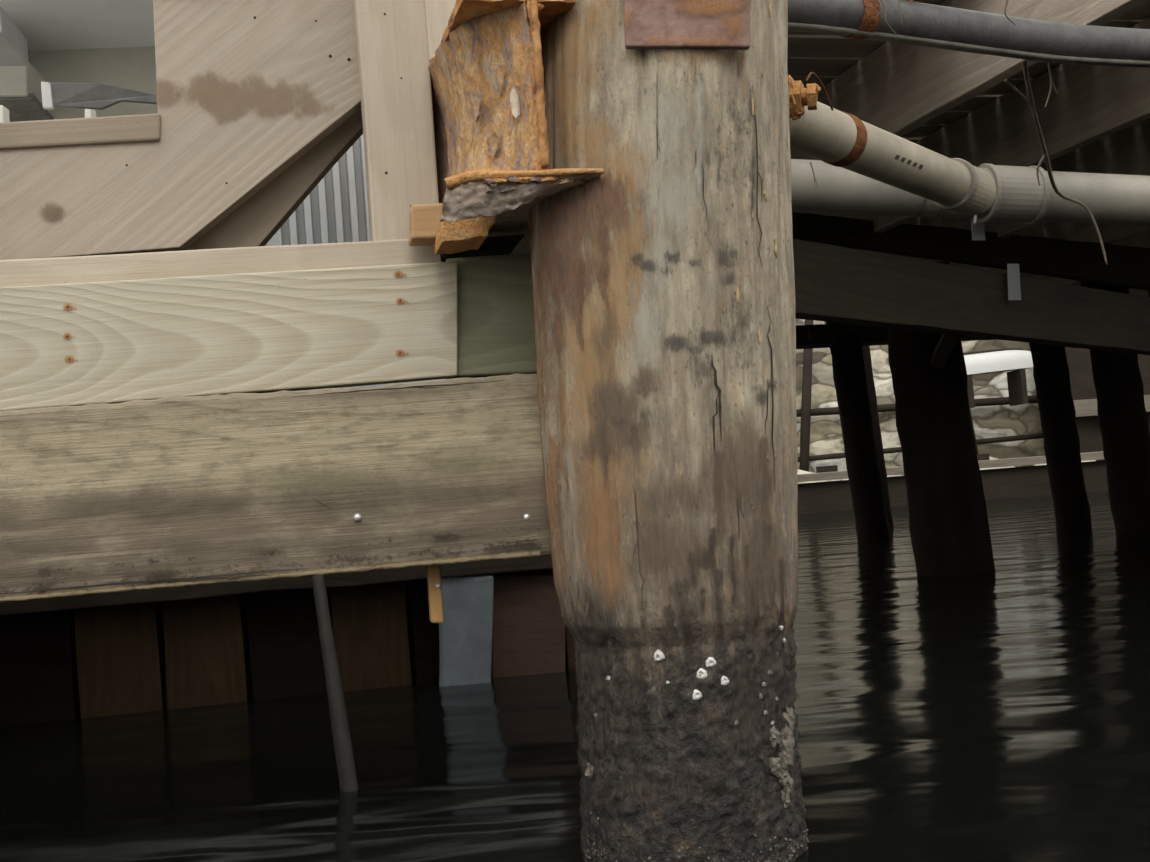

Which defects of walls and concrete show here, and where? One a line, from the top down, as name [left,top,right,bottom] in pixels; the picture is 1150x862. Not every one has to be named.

water stain [191,75,317,119]
water stain [632,79,754,283]
water stain [636,300,752,383]
water stain [588,370,653,481]
water stain [322,528,541,568]
water stain [572,597,695,806]